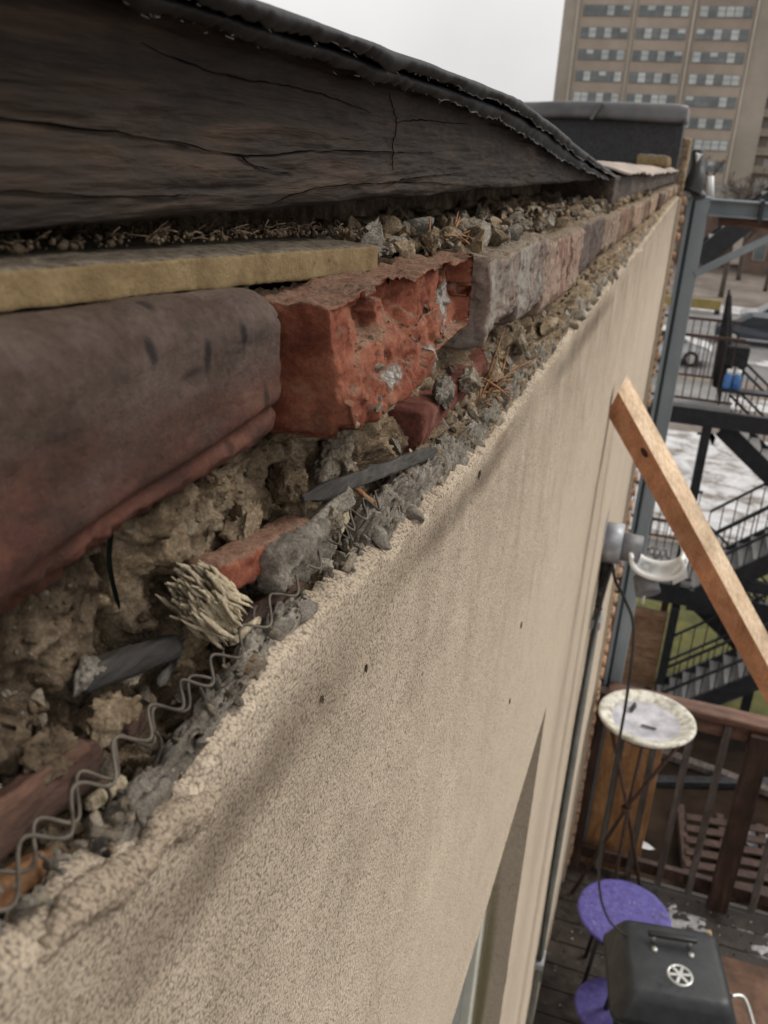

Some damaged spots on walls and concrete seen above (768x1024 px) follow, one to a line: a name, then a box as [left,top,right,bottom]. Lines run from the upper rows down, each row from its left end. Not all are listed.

crack [0,42,490,204]
spalling [568,259,628,330]
spalling [406,503,425,524]
spalling [371,525,392,551]
spalling [263,599,319,642]
spalling [245,656,268,680]